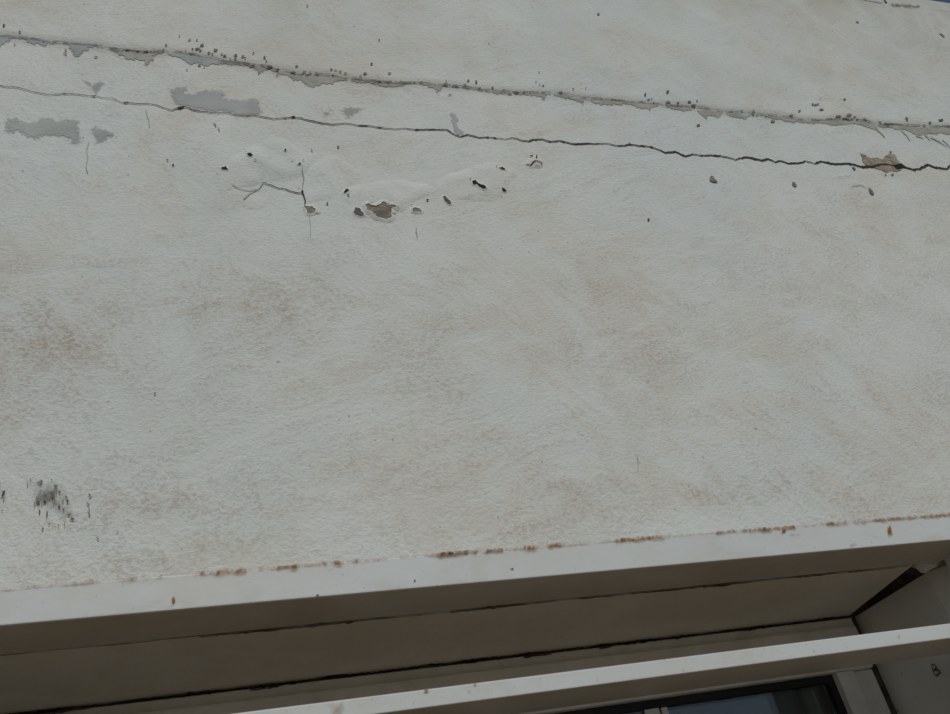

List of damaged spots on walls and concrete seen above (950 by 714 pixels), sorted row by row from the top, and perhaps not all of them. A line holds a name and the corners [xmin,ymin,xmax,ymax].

peeling [0,24,950,135]
flaking render [6,117,80,143]
flaking render [92,128,114,142]
crack [0,85,950,171]
flaking render [852,151,904,175]
crack [233,148,321,235]
leakage [27,478,74,529]